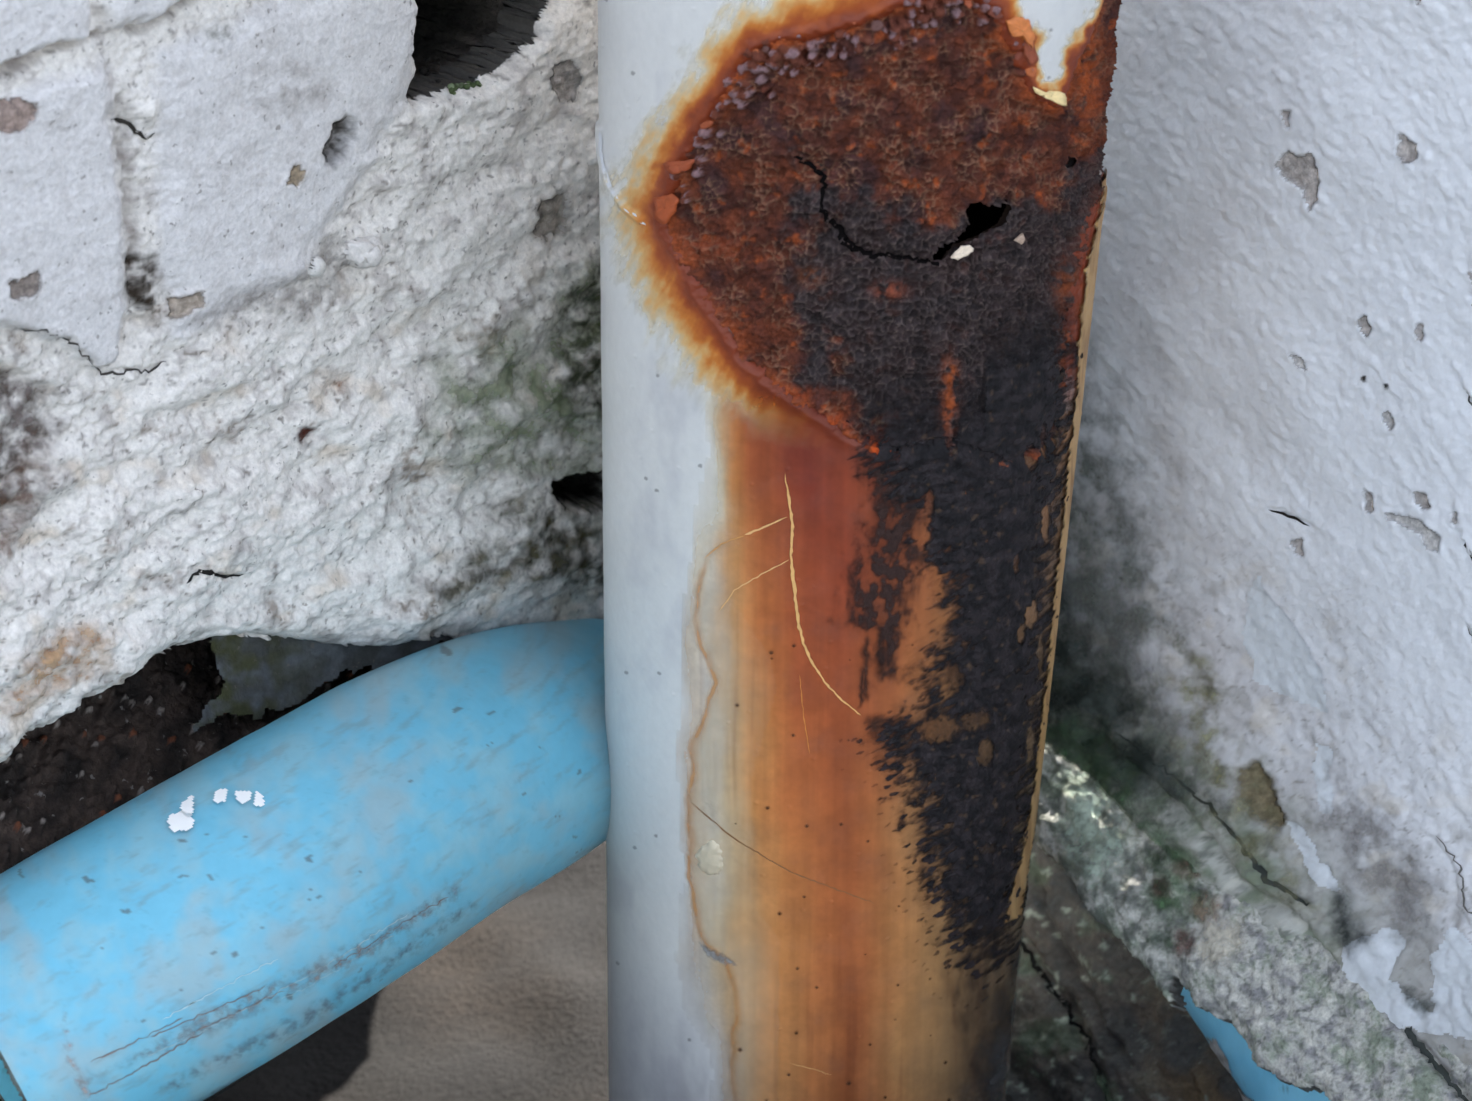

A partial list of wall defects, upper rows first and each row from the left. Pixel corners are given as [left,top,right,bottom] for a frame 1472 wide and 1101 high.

spalling [411,0,522,95]
peeling [0,97,37,134]
crack [22,329,166,375]
crack [187,569,243,583]
rust [611,0,1122,1101]
water stain [1045,443,1191,801]
crack [1166,770,1309,906]
spalling [1236,762,1341,892]
water stain [1336,895,1366,947]
peeling [1341,927,1472,1040]
water stain [1405,989,1433,1012]
crack [1404,1026,1469,1101]